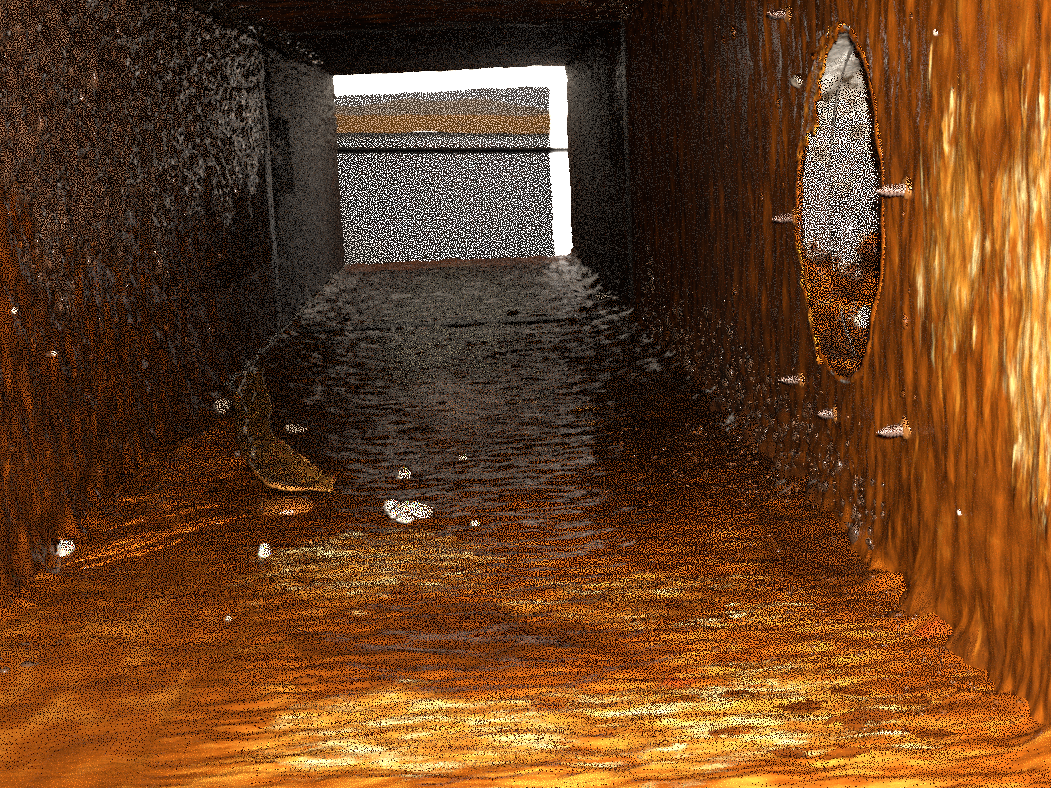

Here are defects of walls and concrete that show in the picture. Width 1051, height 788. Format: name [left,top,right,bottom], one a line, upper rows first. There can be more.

peeling [790,22,846,162]
water stain [920,90,959,214]
corrosion [917,0,1051,180]
peeling [794,228,824,365]
peeling [853,304,871,328]
water stain [918,251,976,368]
water stain [963,209,981,277]
water stain [1012,69,1051,518]
corrosion [749,510,881,594]
corrosion [909,433,1051,656]
corrosion [0,559,286,788]